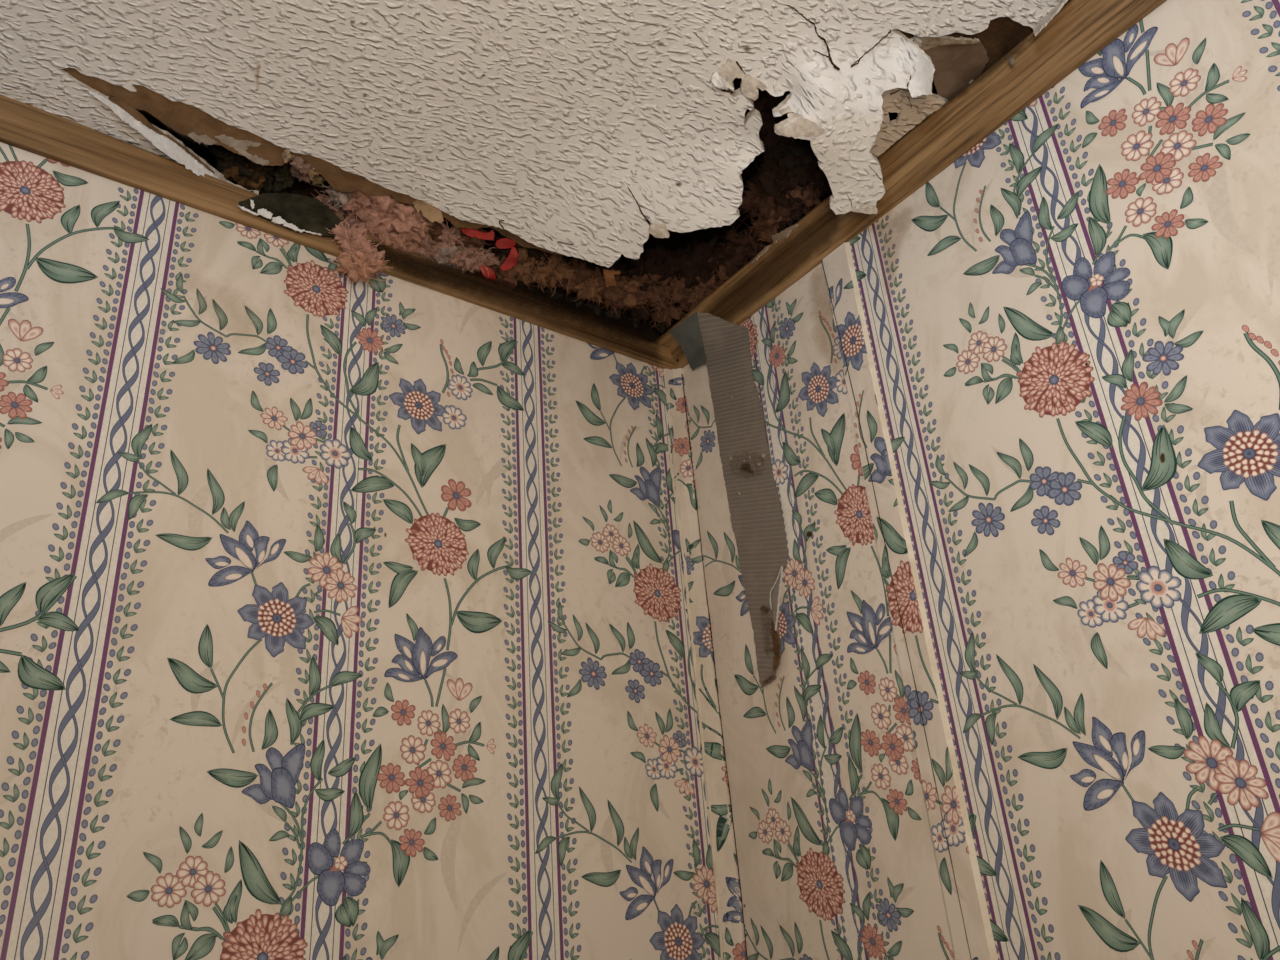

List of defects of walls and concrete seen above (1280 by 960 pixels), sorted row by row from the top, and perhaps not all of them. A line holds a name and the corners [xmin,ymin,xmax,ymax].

crack [787,5,891,71]
peeling [716,0,935,215]
spalling [237,199,322,236]
peeling [649,223,669,238]